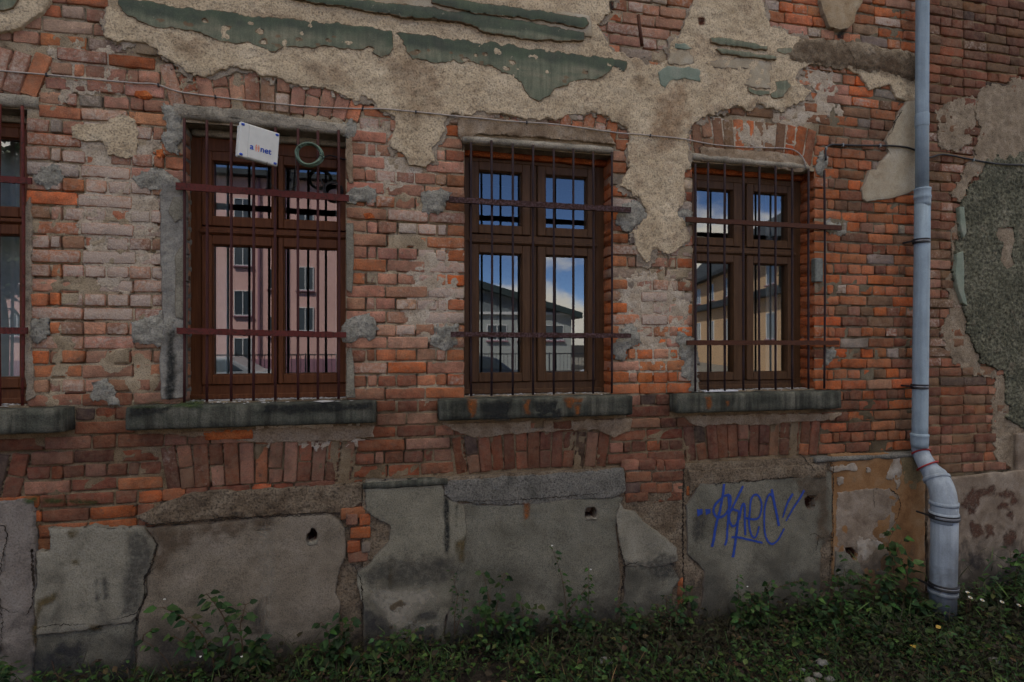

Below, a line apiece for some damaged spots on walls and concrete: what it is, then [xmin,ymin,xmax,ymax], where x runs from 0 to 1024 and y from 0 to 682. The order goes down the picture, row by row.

peeling [0,0,53,34]
peeling [71,114,139,159]
peeling [97,0,915,271]
peeling [934,76,1024,471]
crack [0,525,78,650]
damp [365,498,464,647]
peeling [0,452,926,682]